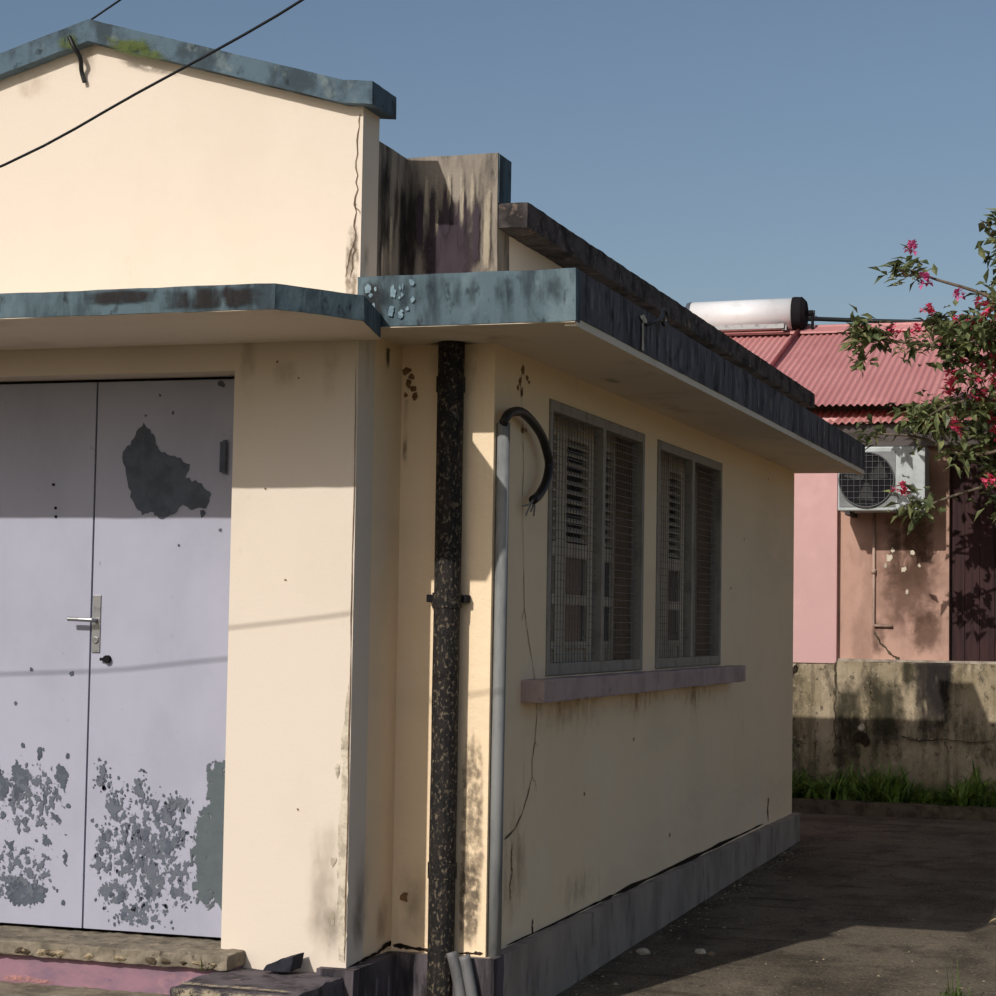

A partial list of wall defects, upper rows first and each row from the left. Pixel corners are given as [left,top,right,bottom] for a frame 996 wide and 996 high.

crack [345,116,360,277]
water stain [381,169,490,276]
peeling [364,279,415,319]
peeling [122,414,211,519]
water stain [890,529,927,609]
water stain [835,689,859,760]
water stain [872,631,951,746]
peeling [0,747,70,908]
peeling [89,757,225,930]
water stain [460,749,482,940]
crack [504,703,537,900]
crack [506,797,769,946]